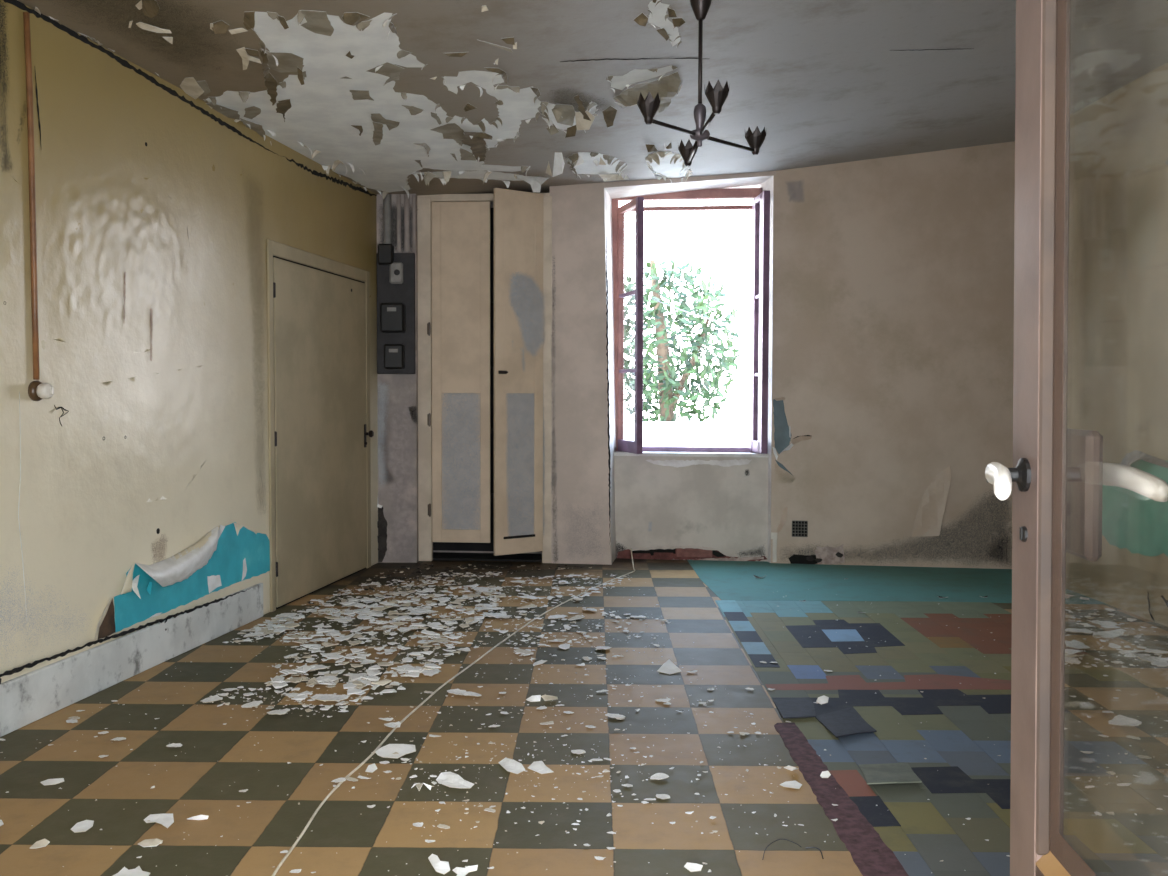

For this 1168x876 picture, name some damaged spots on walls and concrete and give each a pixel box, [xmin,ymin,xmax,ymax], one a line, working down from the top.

peeling [128,0,173,44]
peeling [634,0,685,48]
water stain [0,1,27,176]
peeling [180,10,683,199]
peeling [645,143,693,184]
peeling [95,522,270,640]
crack [0,586,255,684]